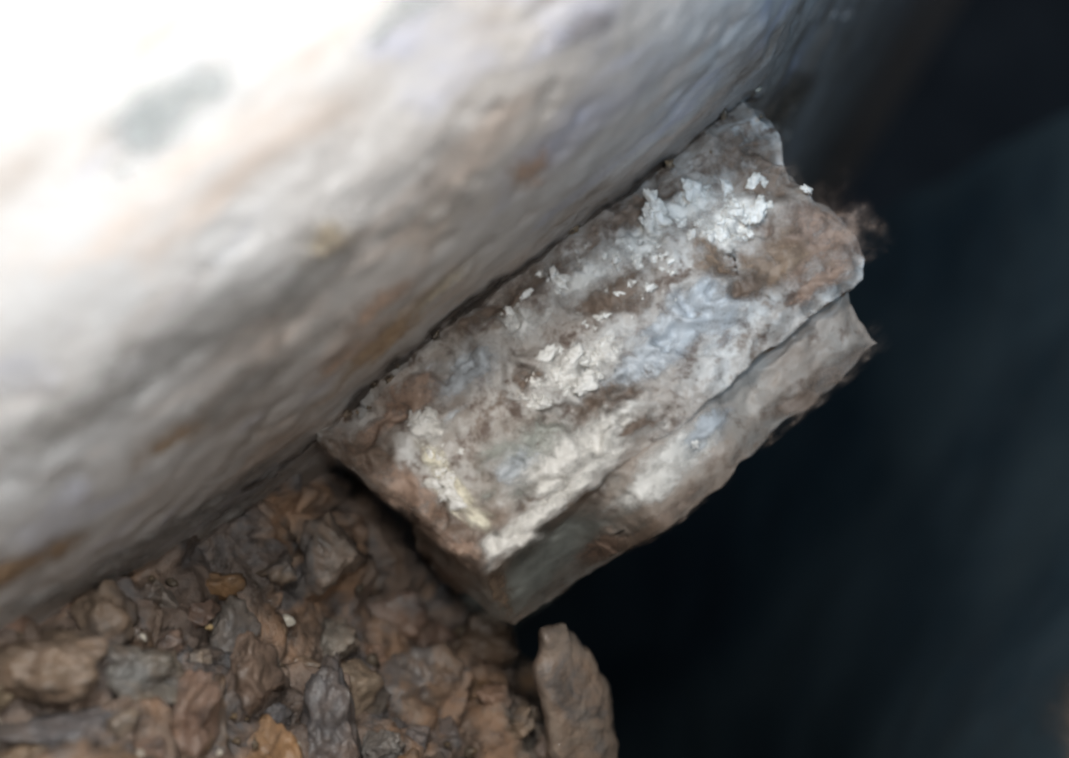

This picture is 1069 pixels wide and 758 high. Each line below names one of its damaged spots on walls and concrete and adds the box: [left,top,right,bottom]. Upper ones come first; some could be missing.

crack [241,97,761,492]
damp [407,172,774,613]